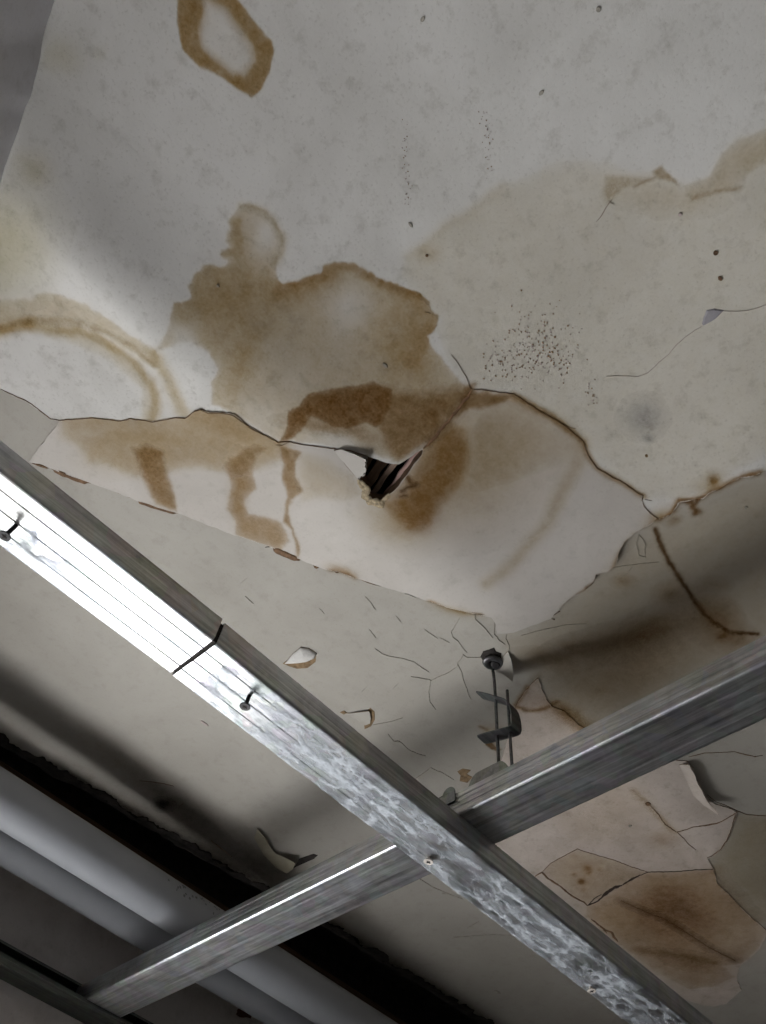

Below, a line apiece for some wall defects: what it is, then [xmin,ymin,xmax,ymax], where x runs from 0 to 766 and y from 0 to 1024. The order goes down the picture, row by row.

leakage [482,300,582,390]
crack [1,389,365,469]
spalling [334,449,420,508]
crack [423,355,657,578]
crack [368,585,577,707]
crack [373,718,454,780]
flaking render [501,678,584,767]
flaking render [495,760,766,1006]